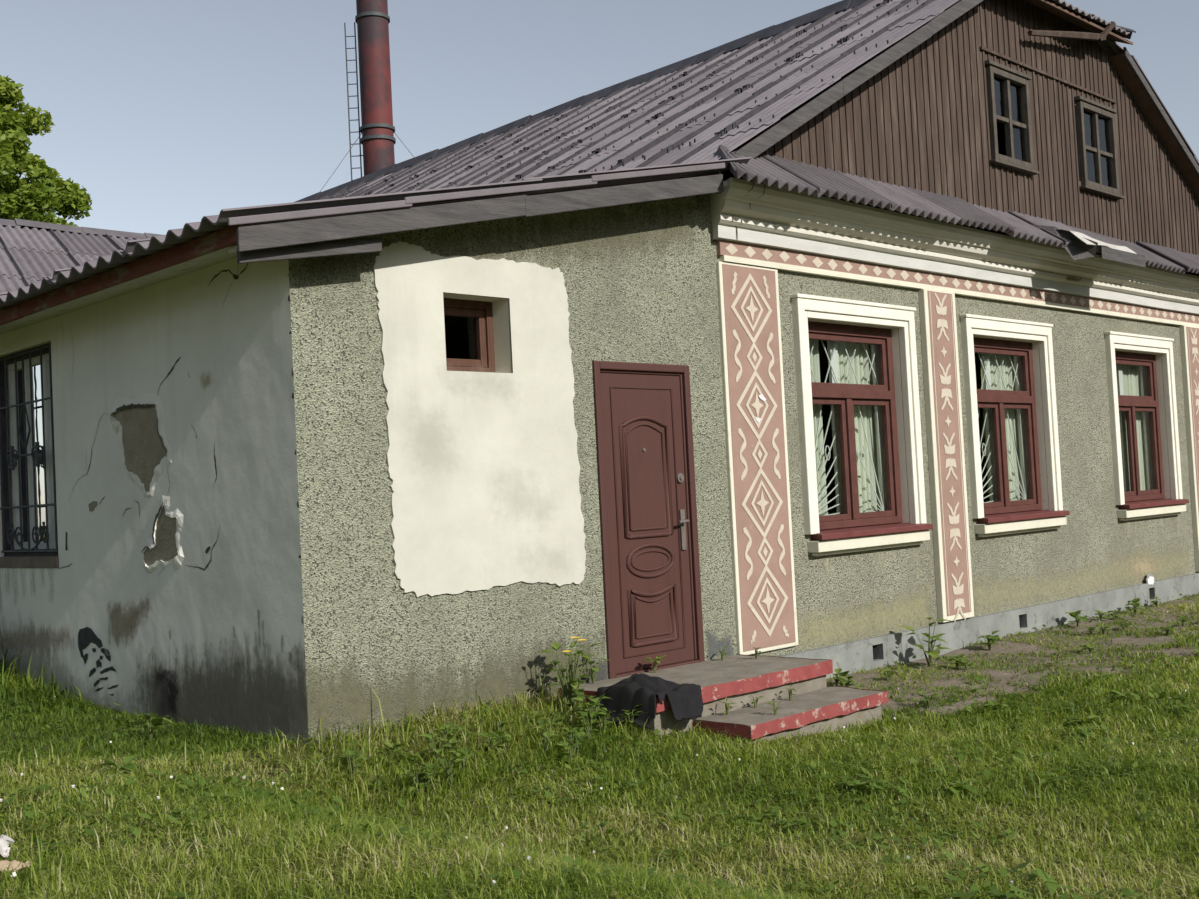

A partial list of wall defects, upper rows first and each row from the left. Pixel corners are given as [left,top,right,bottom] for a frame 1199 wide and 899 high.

crack [208,263,248,307]
crack [71,413,140,515]
spalling [109,393,184,574]
crack [159,527,220,574]
water stain [141,638,608,746]